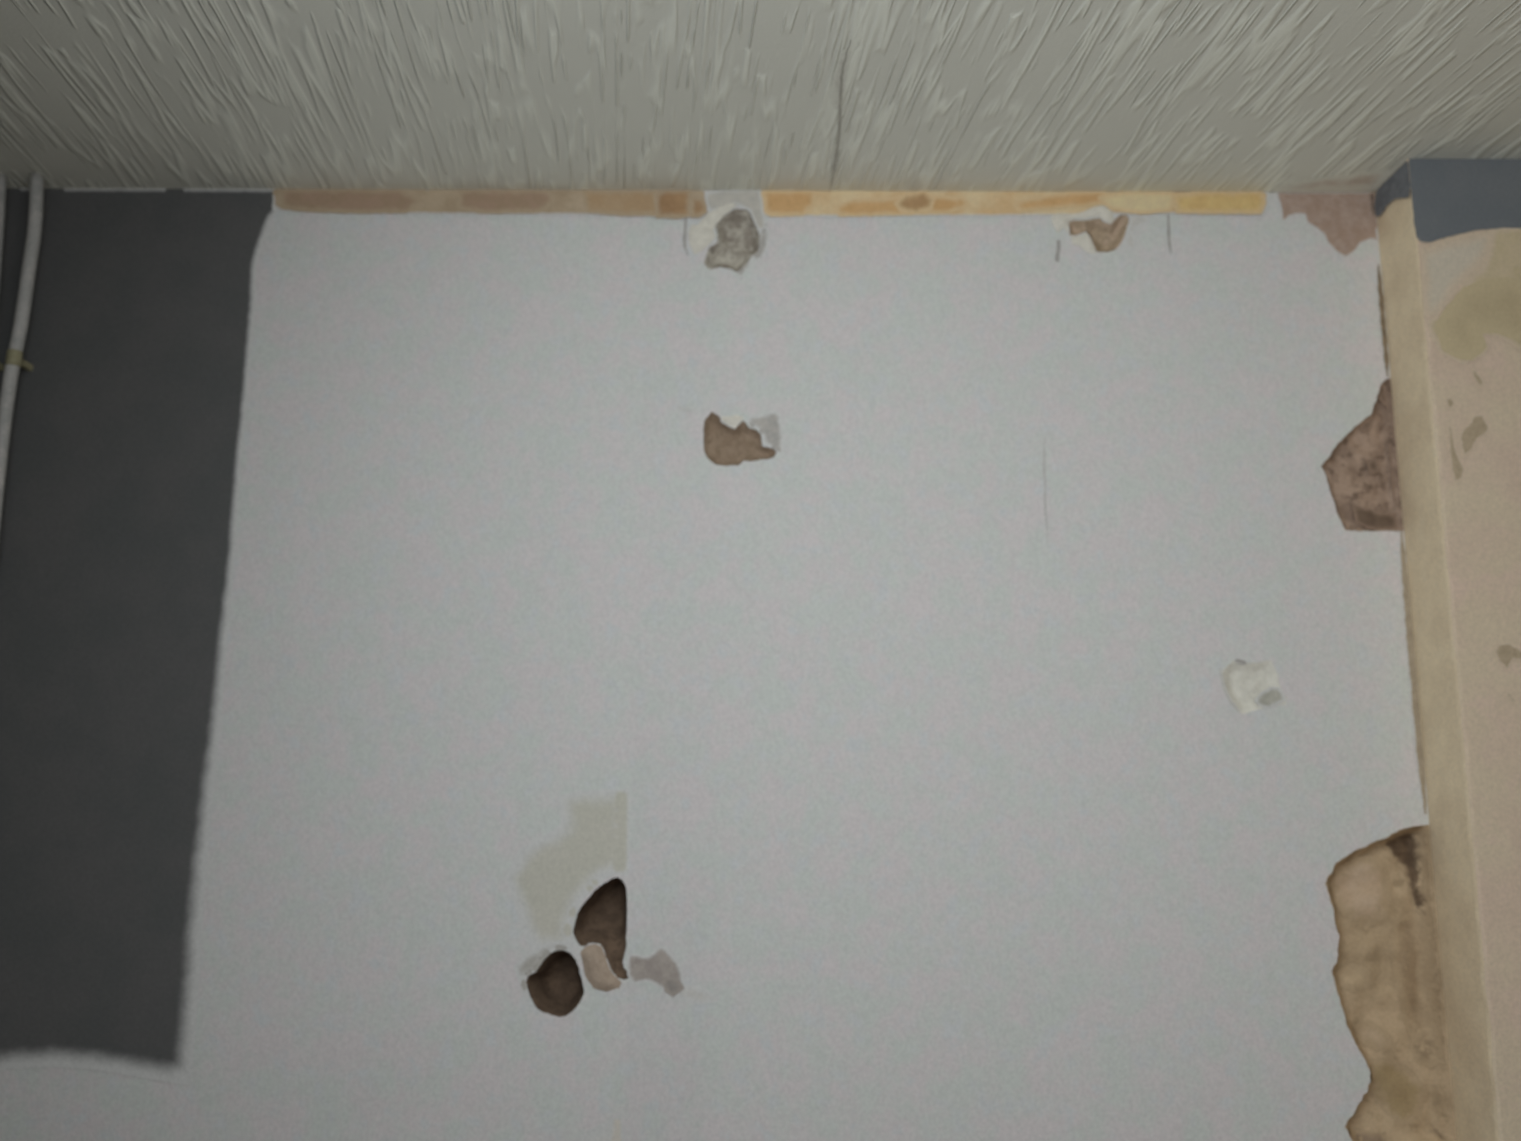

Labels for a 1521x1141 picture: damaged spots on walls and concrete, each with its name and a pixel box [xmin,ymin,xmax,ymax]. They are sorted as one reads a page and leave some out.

spalling [683,190,769,281]
spalling [1051,205,1172,262]
peeling [1276,193,1379,258]
leakage [1427,228,1521,387]
spalling [677,407,784,466]
spalling [1321,378,1404,531]
leakage [1460,415,1489,457]
spalling [1219,658,1287,714]
spalling [513,877,720,1017]
spalling [1325,825,1457,1141]